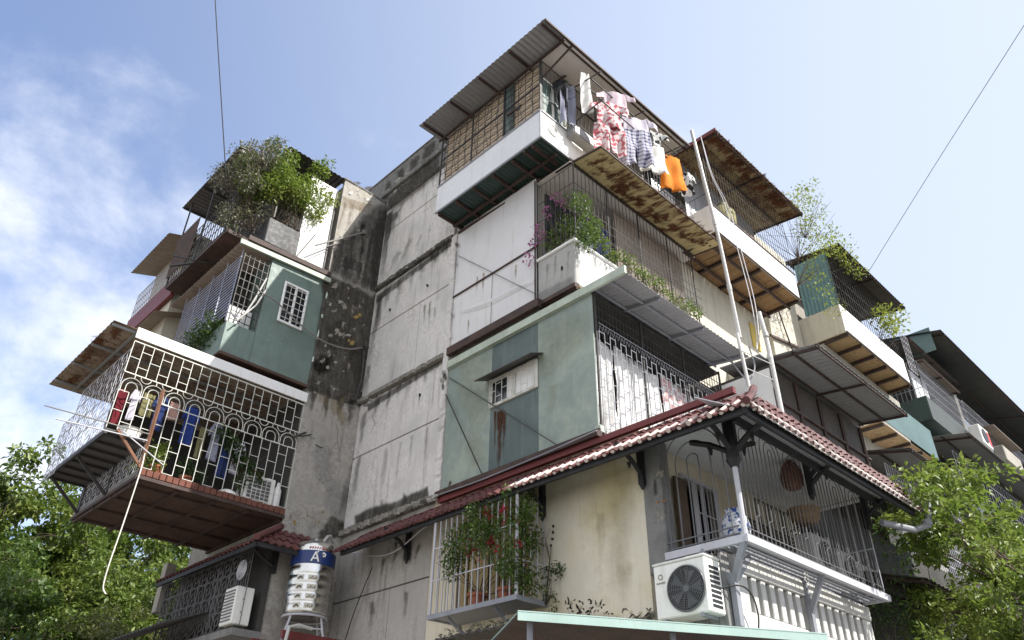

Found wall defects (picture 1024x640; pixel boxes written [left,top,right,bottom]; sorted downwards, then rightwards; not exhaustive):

rust [587,154,717,246]
rust [707,133,796,219]
water stain [307,142,451,413]
rust [65,328,121,384]
rust [494,411,505,460]